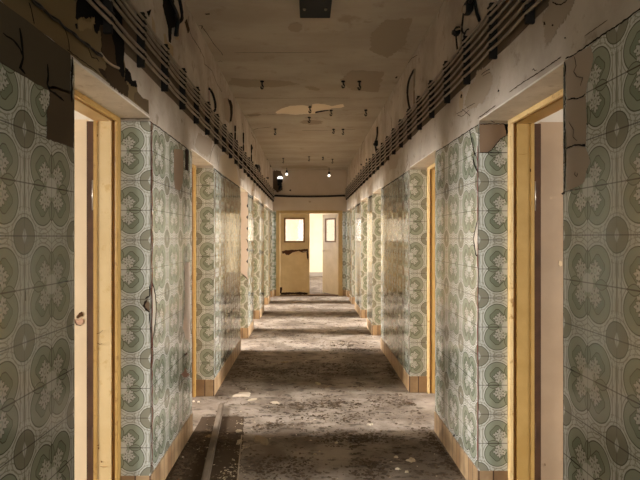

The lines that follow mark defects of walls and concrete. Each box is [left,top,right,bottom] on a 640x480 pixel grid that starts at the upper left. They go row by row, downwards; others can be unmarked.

crack [3,3,35,74]
peeling [0,0,149,148]
peeling [276,104,344,115]
peeling [479,121,508,152]
peeling [561,42,594,195]
peeling [174,149,189,190]
crack [143,285,157,350]